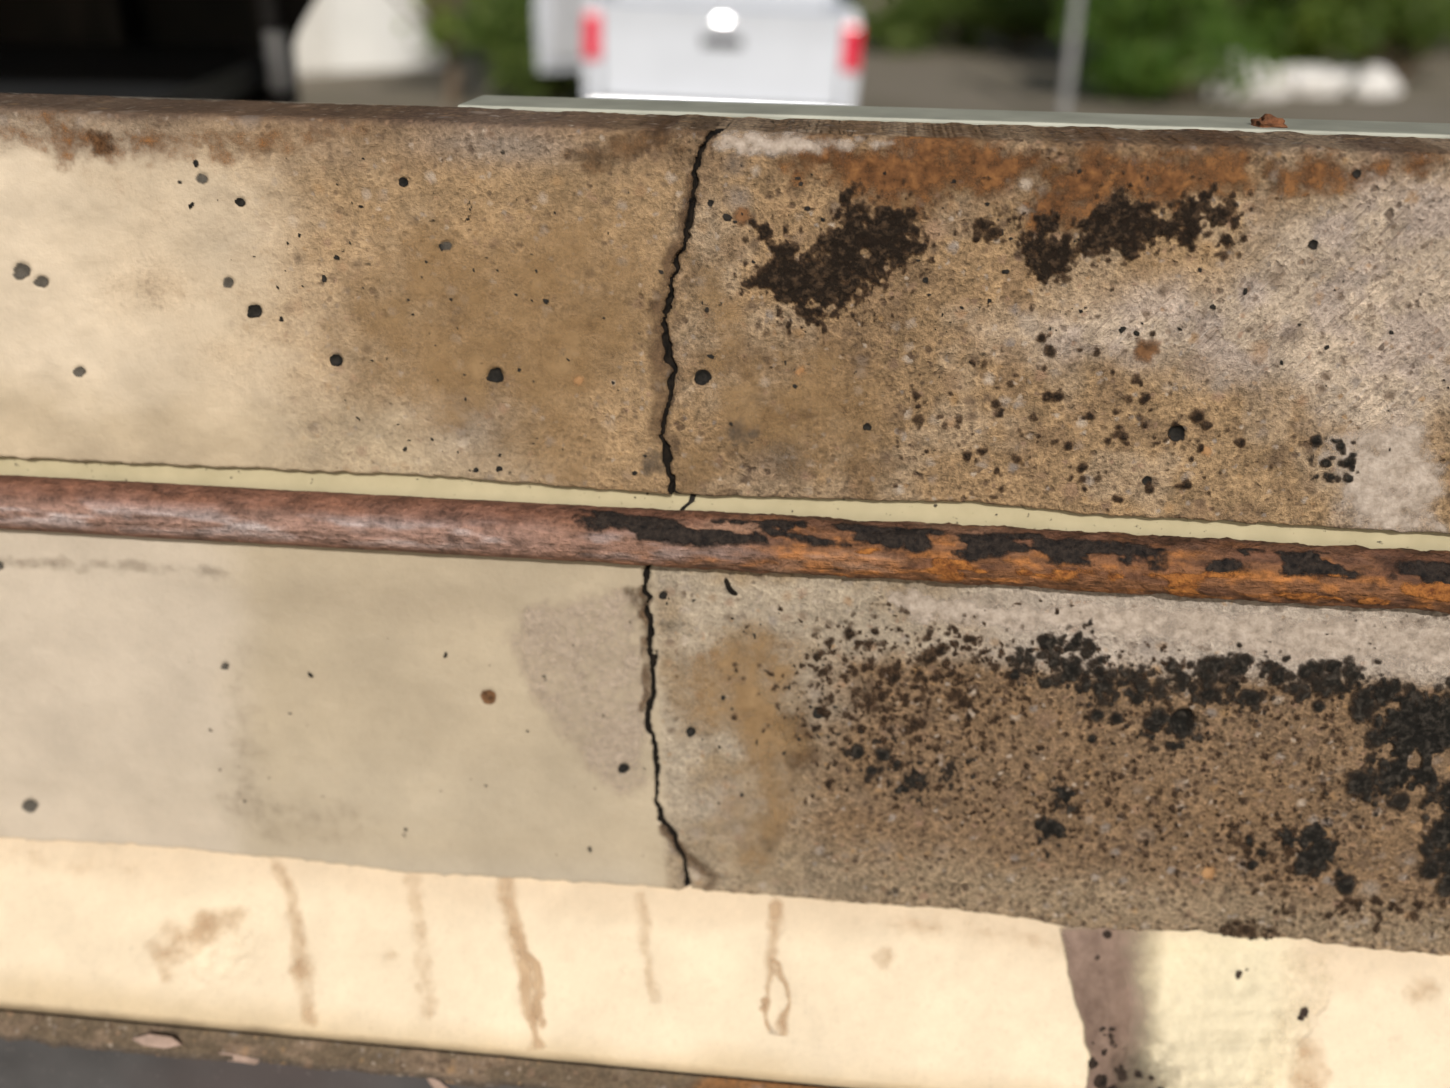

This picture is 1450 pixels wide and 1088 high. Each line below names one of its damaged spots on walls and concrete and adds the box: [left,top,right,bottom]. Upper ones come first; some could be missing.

rust [781,122,1253,233]
water stain [727,171,1279,339]
crack [649,115,733,510]
water stain [1036,333,1057,371]
water stain [911,373,988,463]
water stain [986,374,1246,512]
crack [724,578,738,596]
rust [927,558,988,581]
rust [1149,571,1250,596]
rust [1273,574,1450,605]
crack [640,565,712,886]
water stain [692,599,1450,946]